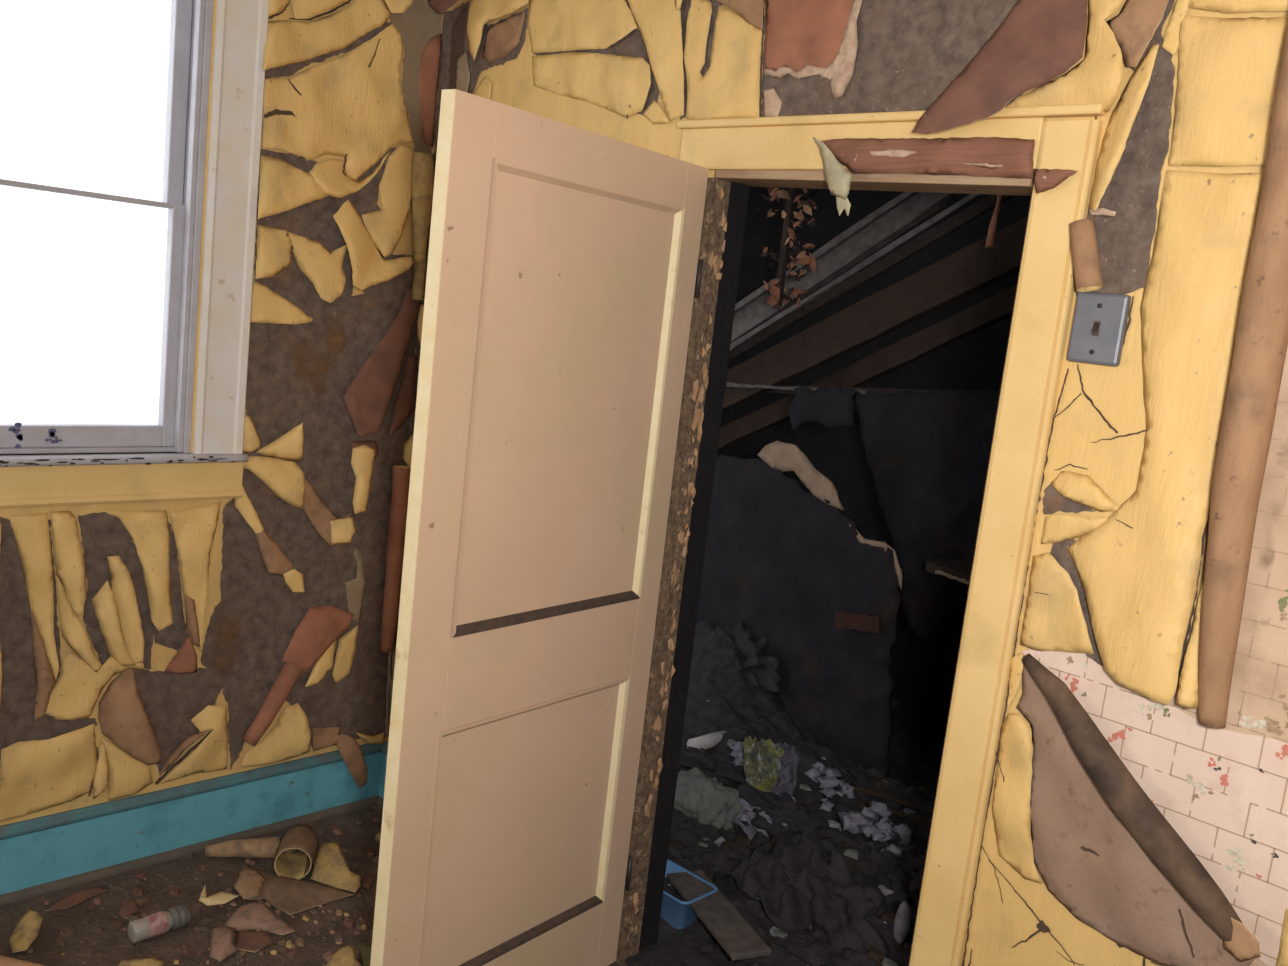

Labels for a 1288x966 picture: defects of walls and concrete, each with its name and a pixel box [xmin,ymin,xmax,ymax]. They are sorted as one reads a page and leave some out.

peeling [0,0,431,822]
peeling [428,0,1288,966]
crack [962,368,1087,966]
crack [1123,296,1134,345]